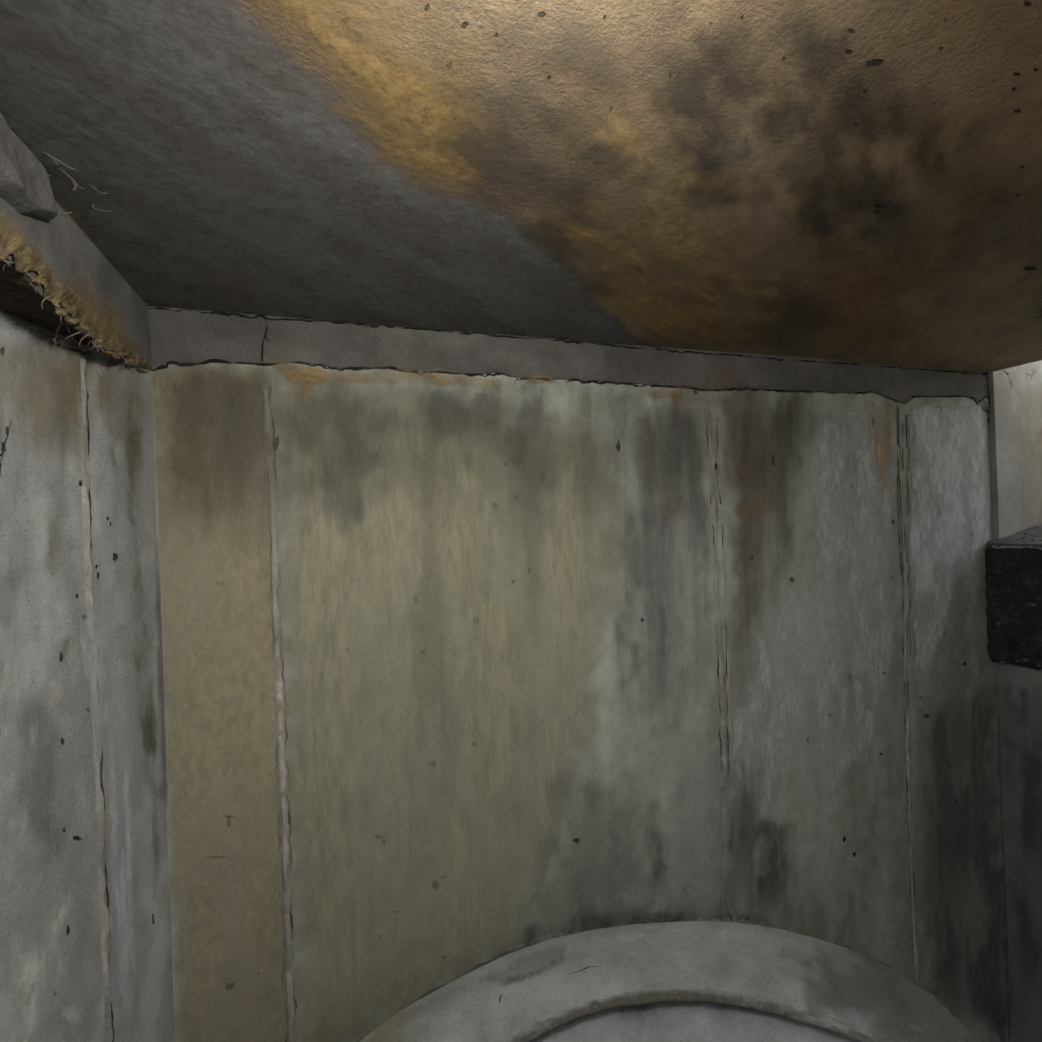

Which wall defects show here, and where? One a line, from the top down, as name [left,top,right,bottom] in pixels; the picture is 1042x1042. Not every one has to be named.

spalling [0,220,154,373]
crack [0,421,11,477]
leakage [285,383,609,1042]
leakage [110,763,134,1018]
leakage [600,907,683,928]
leakage [823,701,1009,1042]